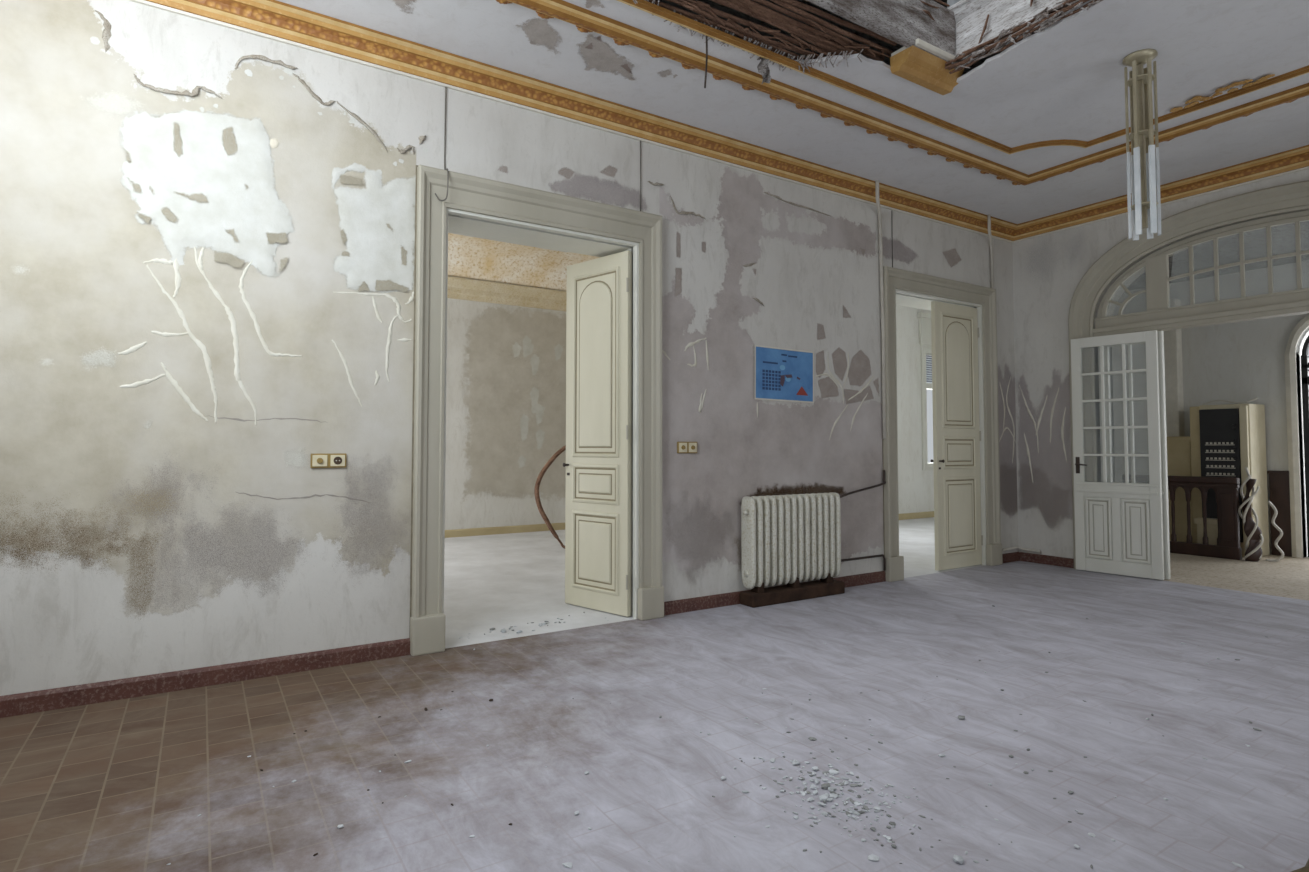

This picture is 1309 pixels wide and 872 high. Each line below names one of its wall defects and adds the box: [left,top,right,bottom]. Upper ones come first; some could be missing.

peeling [516,16,563,55]
peeling [577,34,636,81]
crack [210,415,322,423]
peeling [547,165,919,578]
water stain [998,363,1073,529]
water stain [0,448,411,622]